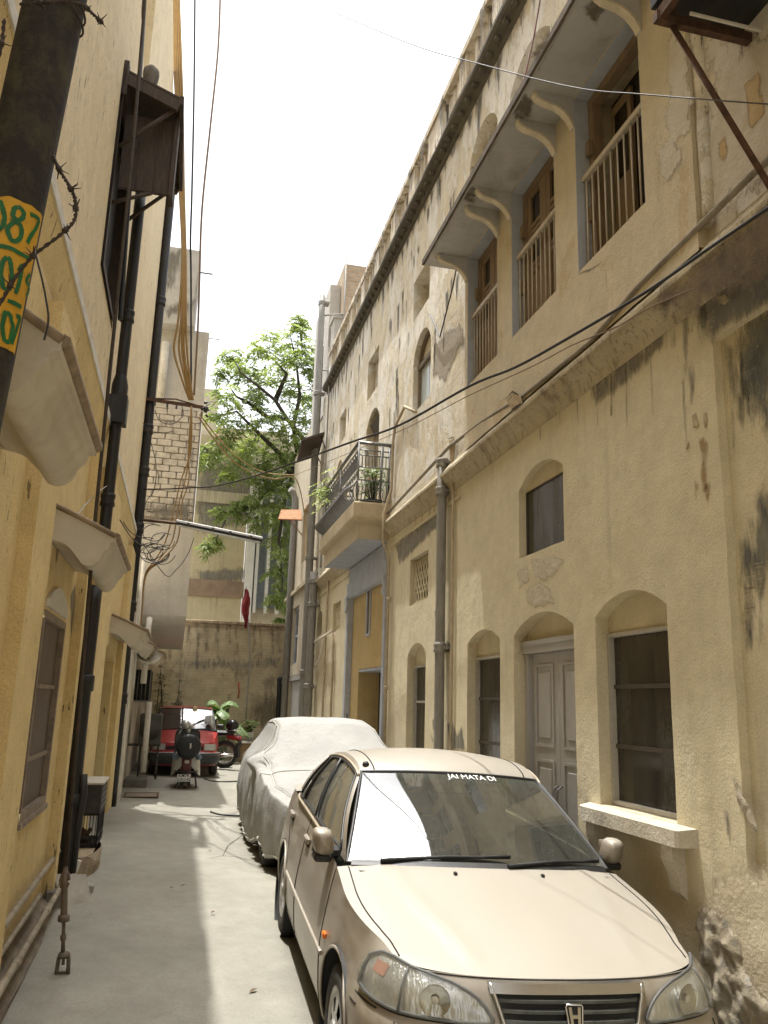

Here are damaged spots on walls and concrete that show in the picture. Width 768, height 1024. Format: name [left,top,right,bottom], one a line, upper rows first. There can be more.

flaking render [704,35,768,206]
damp [593,335,663,414]
rust [695,439,709,500]
damp [396,505,437,560]
damp [743,494,768,589]
flaking render [695,905,768,1024]